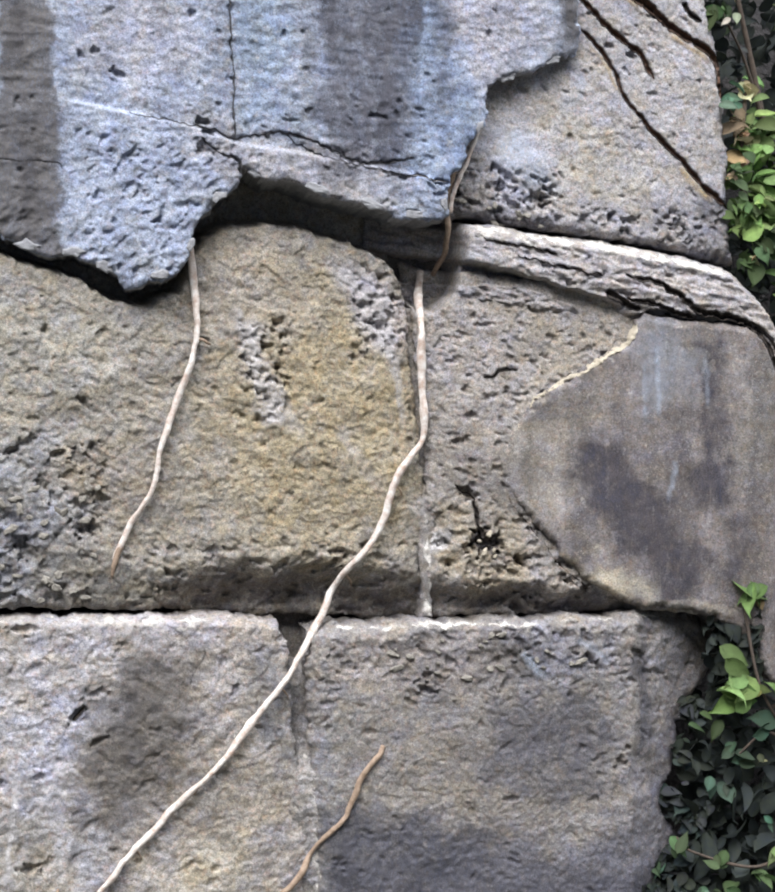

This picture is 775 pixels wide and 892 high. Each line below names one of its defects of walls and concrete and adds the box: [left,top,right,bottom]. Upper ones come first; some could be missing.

leakage [0,0,65,257]
crack [130,0,449,182]
leakage [314,0,423,179]
crack [581,0,726,208]
crack [484,368,518,378]
crack [475,235,775,367]
leakage [689,340,732,505]
leakage [574,443,712,600]